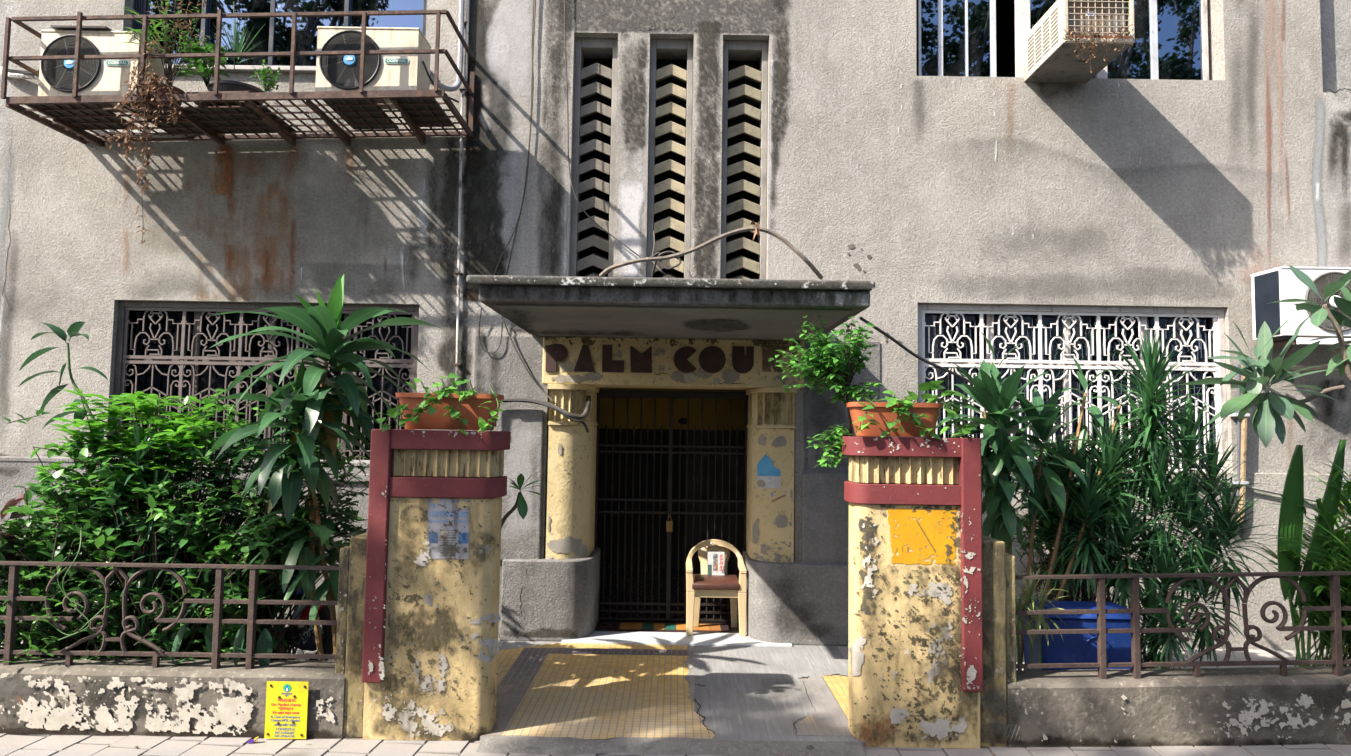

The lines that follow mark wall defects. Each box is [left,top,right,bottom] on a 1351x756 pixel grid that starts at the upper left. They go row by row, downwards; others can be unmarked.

damp [1330,112,1351,176]
damp [369,0,873,394]
peeling [414,541,431,567]
peeling [861,523,879,598]
peeling [847,635,870,680]
peeling [889,509,1043,743]
peeling [0,673,253,736]
peeling [313,697,335,724]
peeling [368,644,454,738]
peeling [1214,685,1351,739]